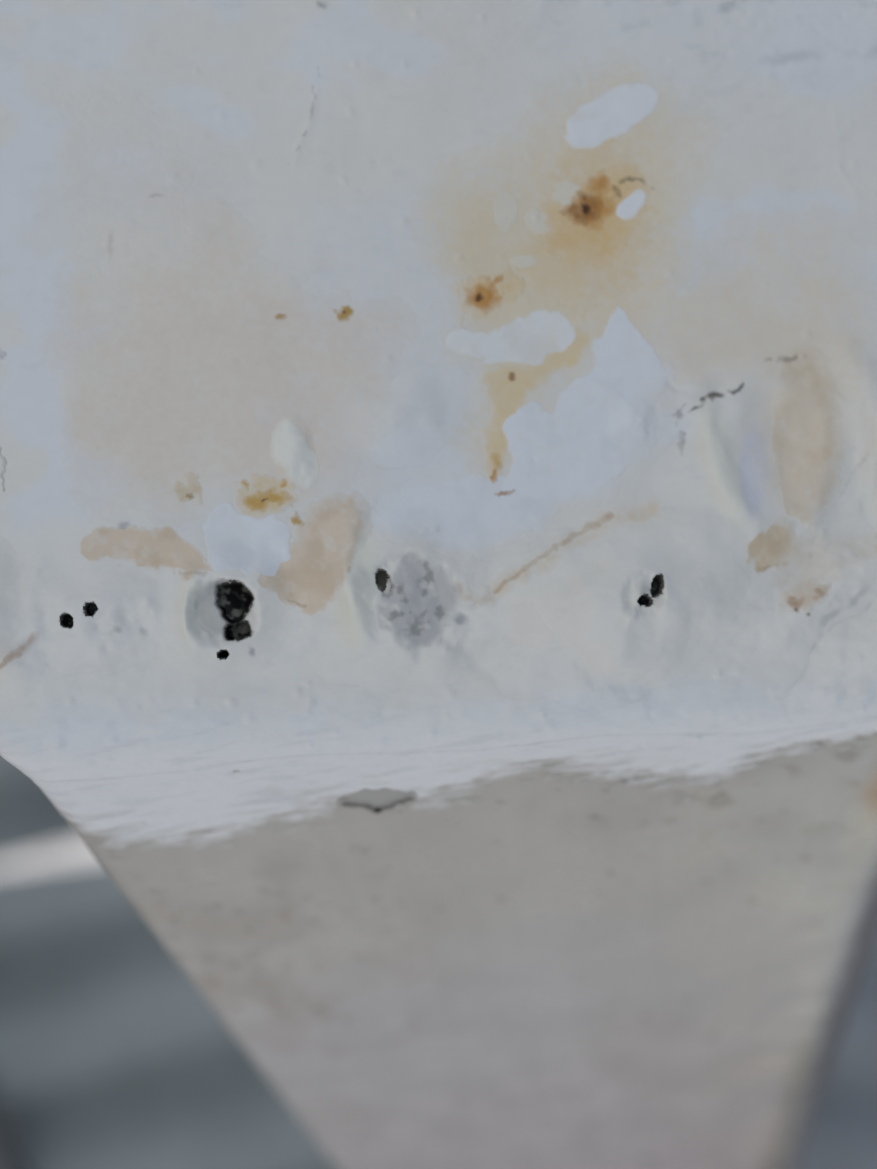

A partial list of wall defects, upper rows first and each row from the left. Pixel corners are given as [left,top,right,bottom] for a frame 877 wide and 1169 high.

peeling [563,82,660,149]
rust [541,160,650,282]
rust [454,264,527,328]
peeling [78,306,676,652]
peeling [336,788,418,815]